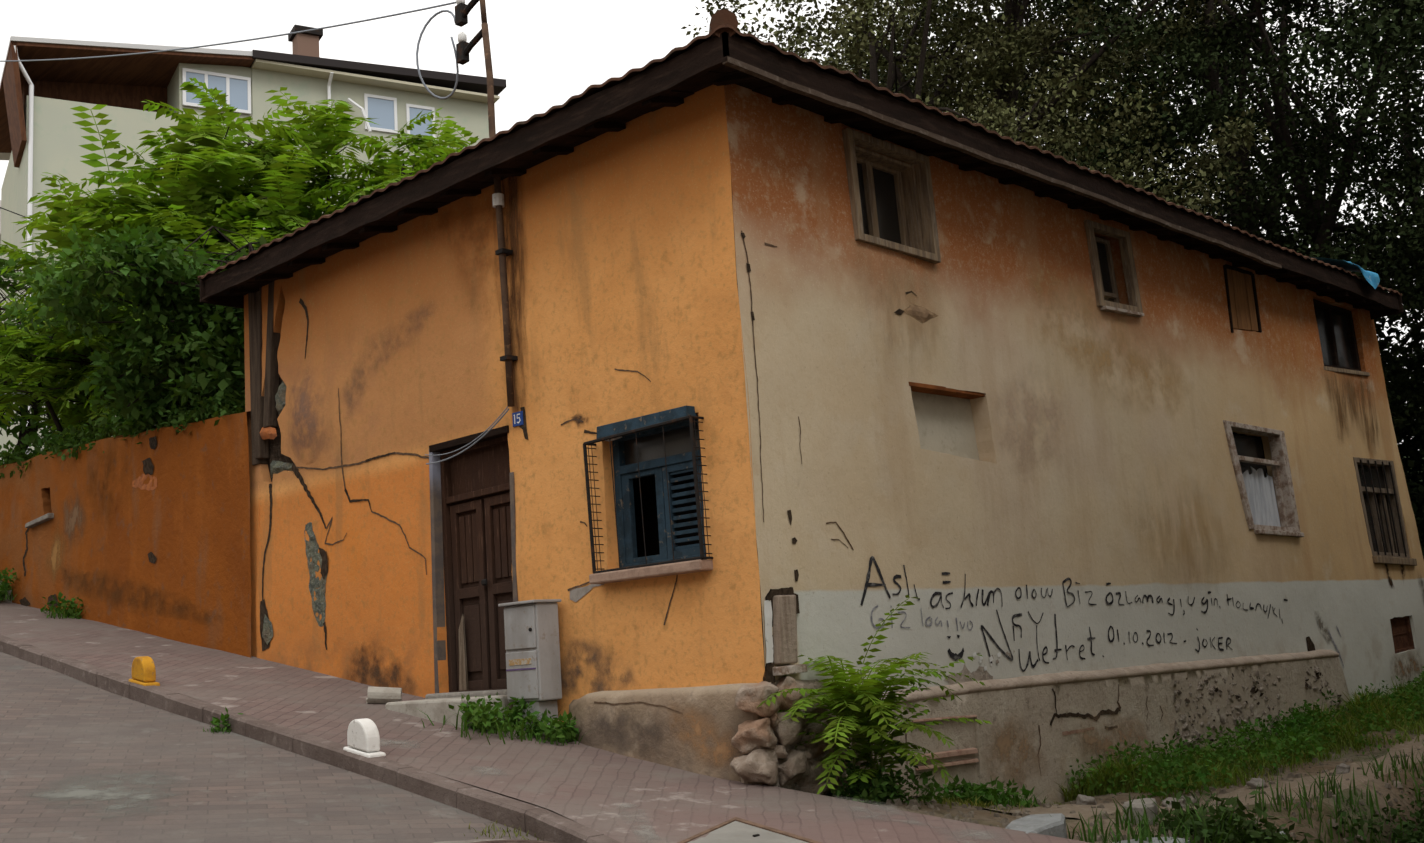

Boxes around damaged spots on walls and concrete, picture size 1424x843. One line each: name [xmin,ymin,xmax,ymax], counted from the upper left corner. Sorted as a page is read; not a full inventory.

crack [260,388,429,651]
spalling [304,522,328,650]
crack [1038,685,1163,774]
spalling [1173,668,1286,748]